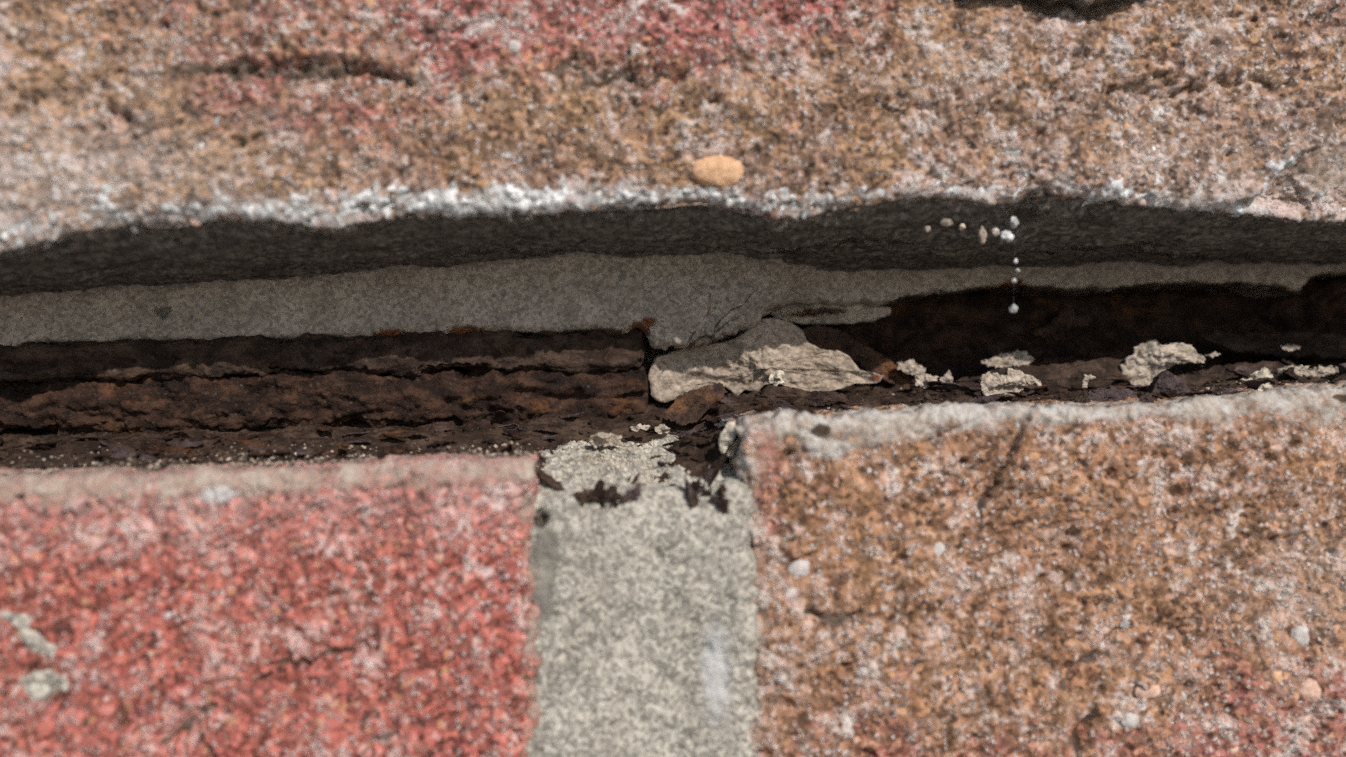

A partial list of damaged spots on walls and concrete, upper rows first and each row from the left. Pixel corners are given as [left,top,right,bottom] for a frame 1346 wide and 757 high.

crack [955,0,1146,19]
crack [978,409,1030,531]